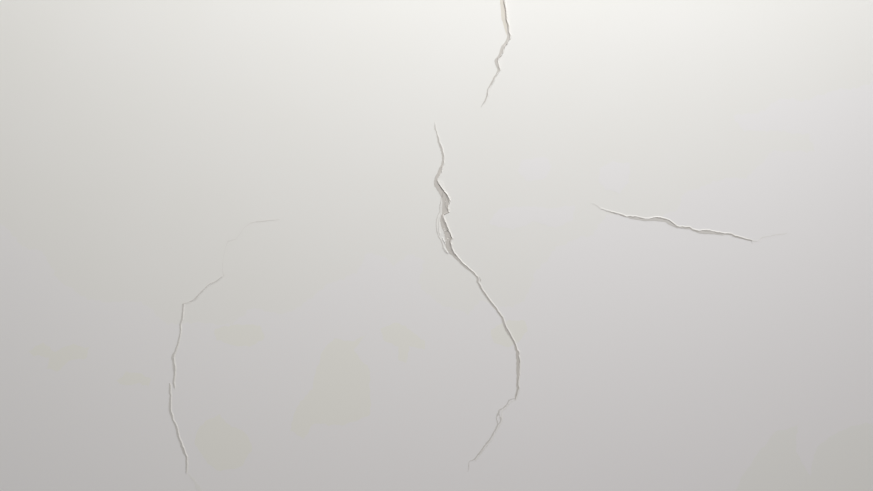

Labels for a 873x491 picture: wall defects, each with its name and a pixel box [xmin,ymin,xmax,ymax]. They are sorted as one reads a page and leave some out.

crack [481,0,512,107]
crack [595,204,786,242]
crack [434,123,521,470]